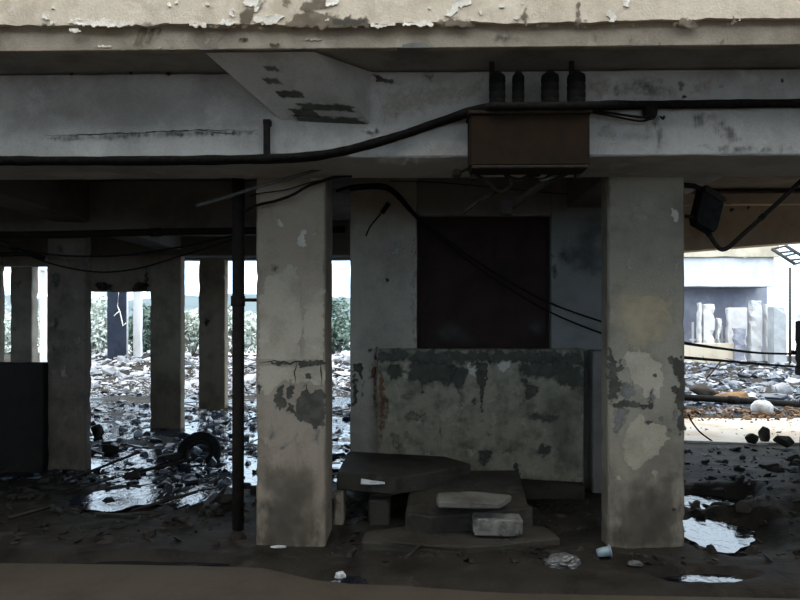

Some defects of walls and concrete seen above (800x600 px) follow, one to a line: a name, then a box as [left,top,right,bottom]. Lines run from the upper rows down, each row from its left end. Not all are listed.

peeling [68,18,134,33]
peeling [218,8,236,26]
peeling [243,0,284,25]
peeling [371,20,433,29]
peeling [445,0,471,17]
spalling [262,66,367,124]
peeling [257,264,326,429]
crack [262,360,326,390]
damp [351,363,363,406]
damp [368,347,585,412]
peeling [606,348,687,470]